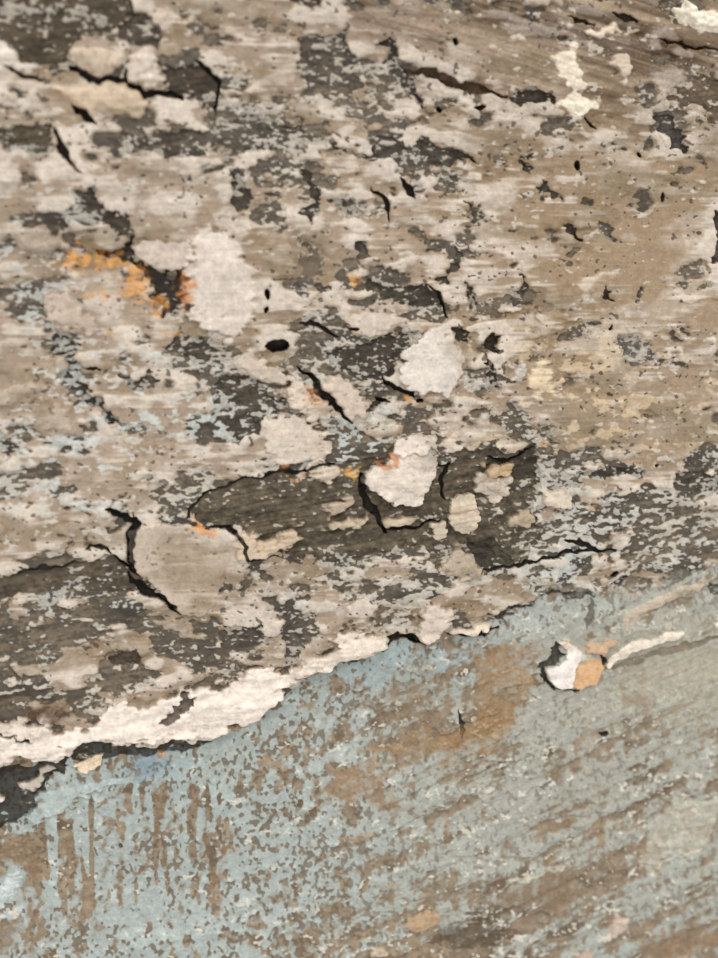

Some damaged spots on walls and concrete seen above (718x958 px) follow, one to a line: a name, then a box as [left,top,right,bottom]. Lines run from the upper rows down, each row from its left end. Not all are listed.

spalling [0,0,162,77]
crack [68,64,184,101]
spalling [107,128,215,162]
crack [195,60,222,115]
spalling [296,28,364,94]
spalling [329,135,478,197]
spalling [652,72,718,154]
rust [60,240,199,347]
spalling [0,186,572,617]
crack [186,462,335,563]
crack [357,462,451,534]
spalling [0,739,213,827]